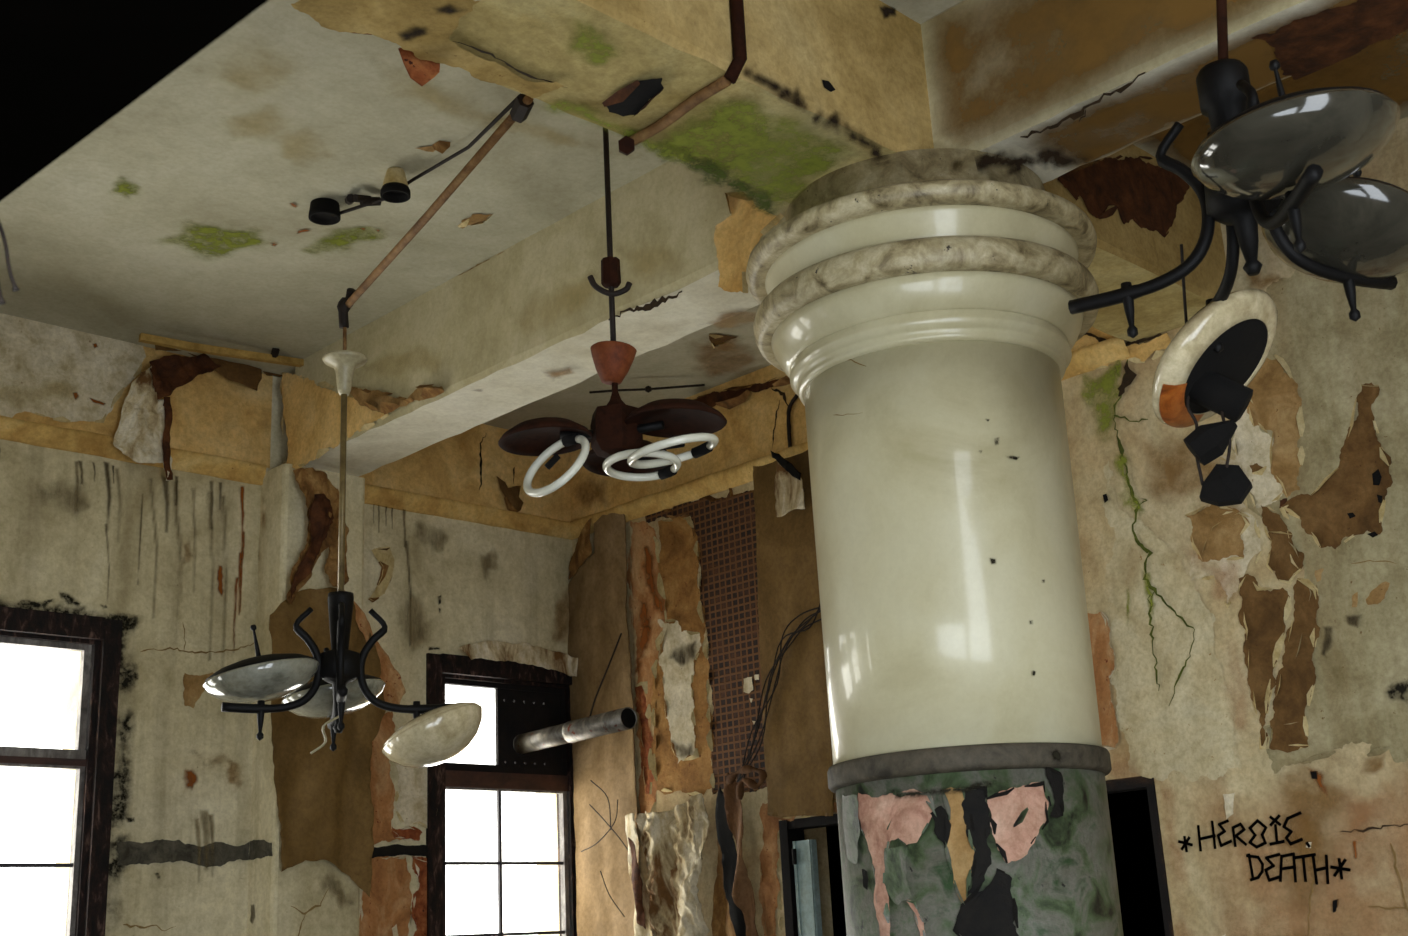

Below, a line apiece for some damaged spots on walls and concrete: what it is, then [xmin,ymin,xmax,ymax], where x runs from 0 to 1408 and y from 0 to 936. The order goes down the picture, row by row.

peeling [291,0,564,99]
peeling [1252,0,1408,80]
flaking render [602,78,664,117]
water stain [114,183,137,195]
water stain [549,102,842,214]
water stain [168,226,261,256]
water stain [308,228,377,253]
water stain [59,461,119,512]
water stain [139,476,179,558]
peeling [1088,270,1408,819]
flaking render [627,488,811,936]
peeling [833,767,1064,936]